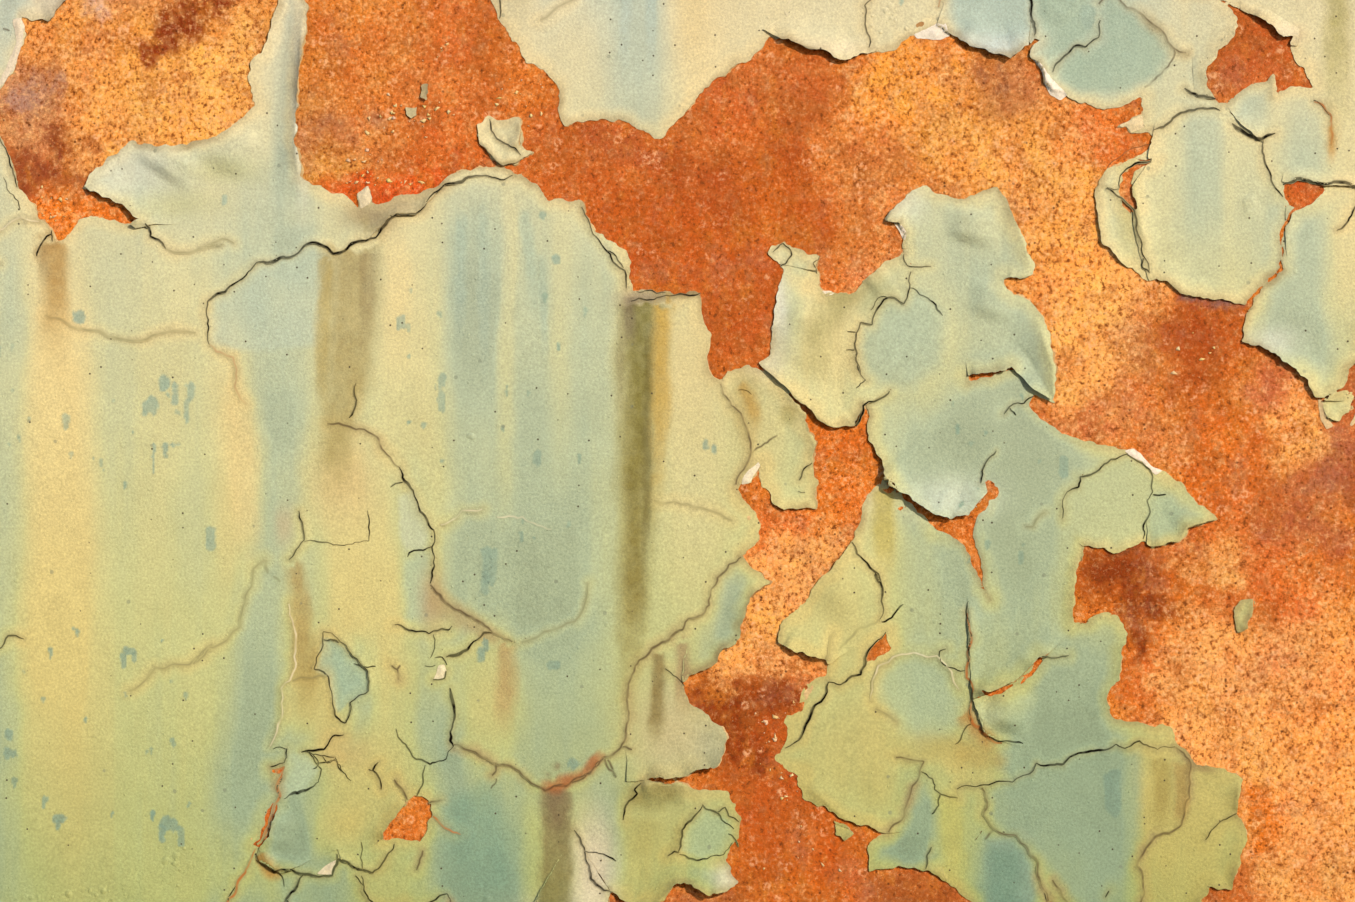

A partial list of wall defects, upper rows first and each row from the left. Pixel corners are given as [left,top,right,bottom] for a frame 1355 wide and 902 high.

rust [0,0,278,312]
peeling [85,0,321,228]
crack [206,119,521,404]
peeling [914,0,1355,429]
water stain [0,290,139,704]
water stain [204,373,266,568]
rust [280,548,324,737]
crack [226,383,741,902]
water stain [428,773,541,902]
rust [294,0,1355,902]
peeling [722,185,1247,902]
crack [888,601,1237,902]